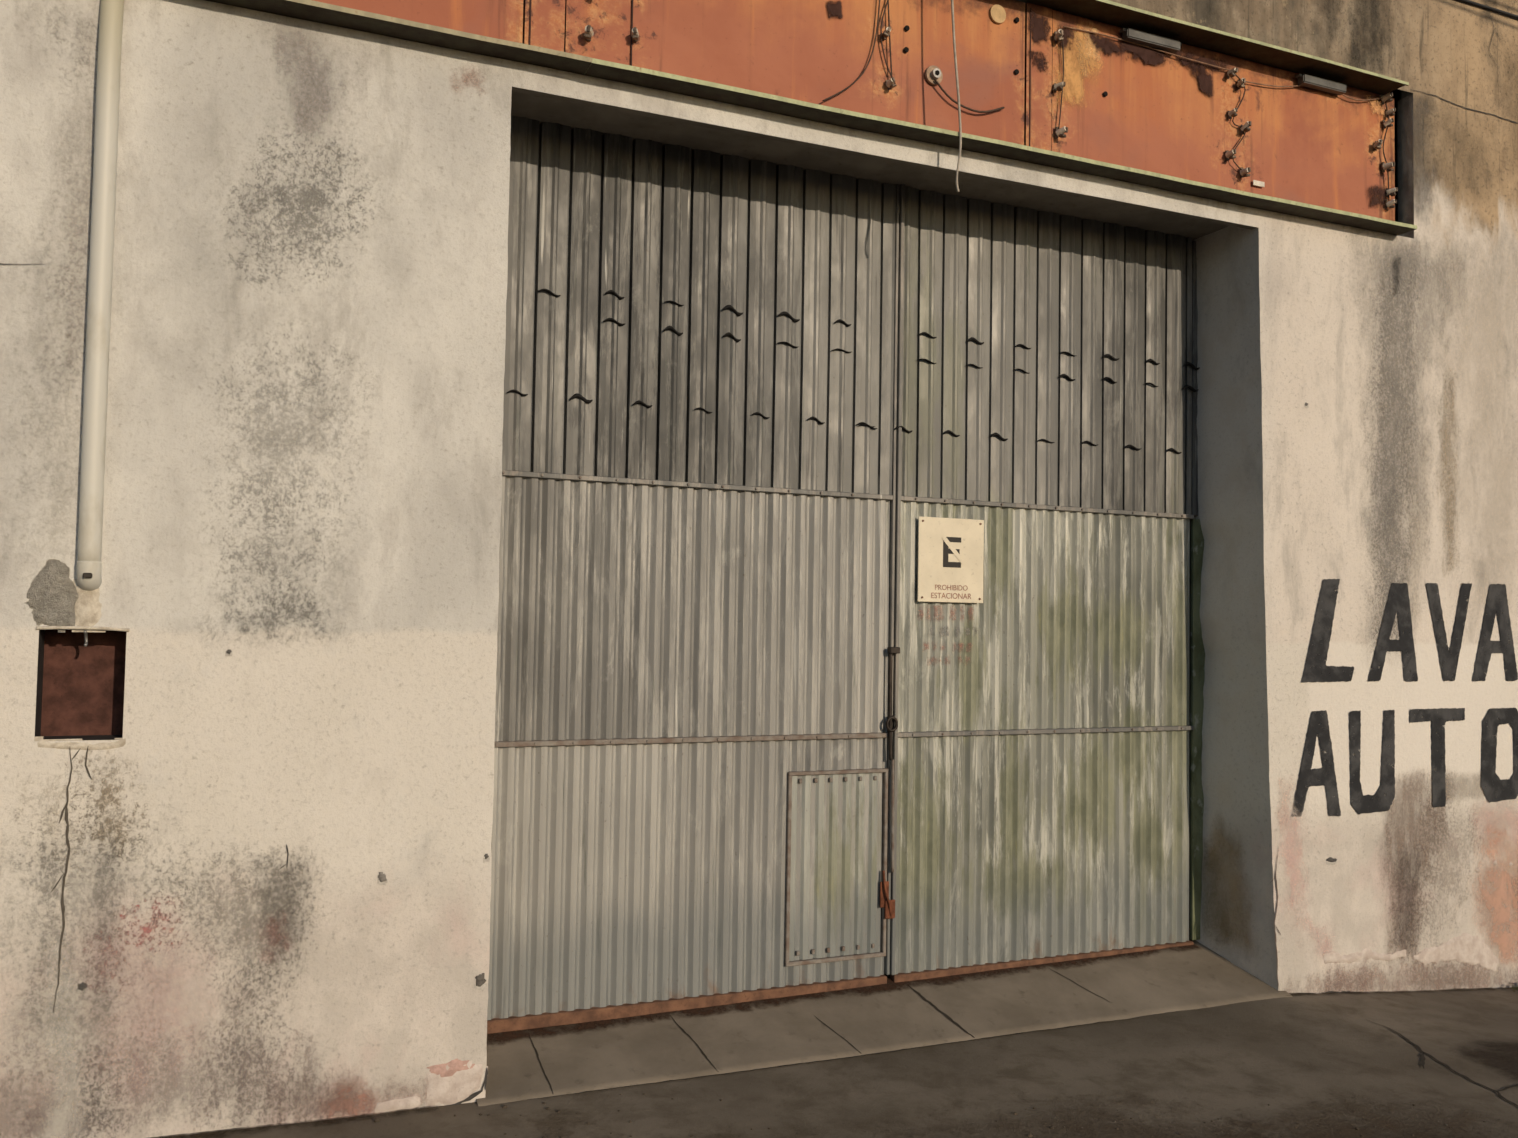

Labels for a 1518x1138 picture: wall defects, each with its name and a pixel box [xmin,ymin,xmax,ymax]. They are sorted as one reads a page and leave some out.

rust [826,1,843,18]
rust [1029,10,1228,103]
damp [1350,0,1385,71]
rust [1368,185,1391,210]
crack [51,747,92,1013]
crack [1270,847,1351,994]
damp [1387,781,1444,950]
spalling [327,1058,488,1118]